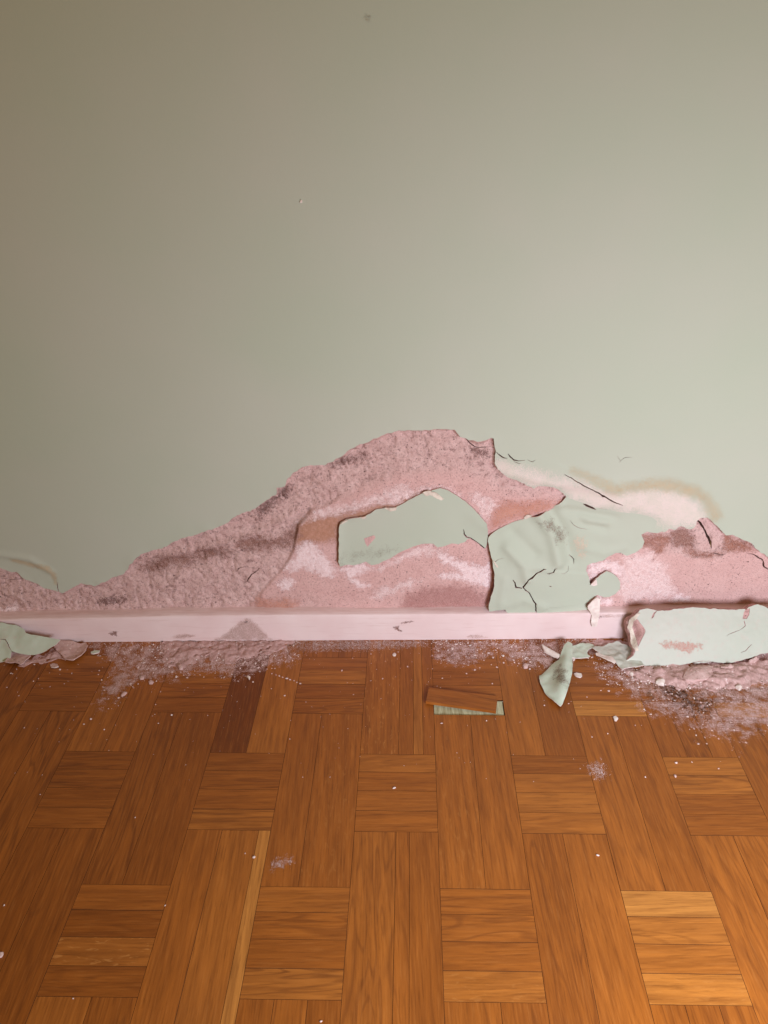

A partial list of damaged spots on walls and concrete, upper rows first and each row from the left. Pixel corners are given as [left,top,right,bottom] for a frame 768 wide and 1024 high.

spalling [0,429,566,641]
crack [513,556,574,611]
crack [564,474,619,524]
water stain [468,446,724,531]
spalling [586,518,768,627]
peeling [572,641,644,678]